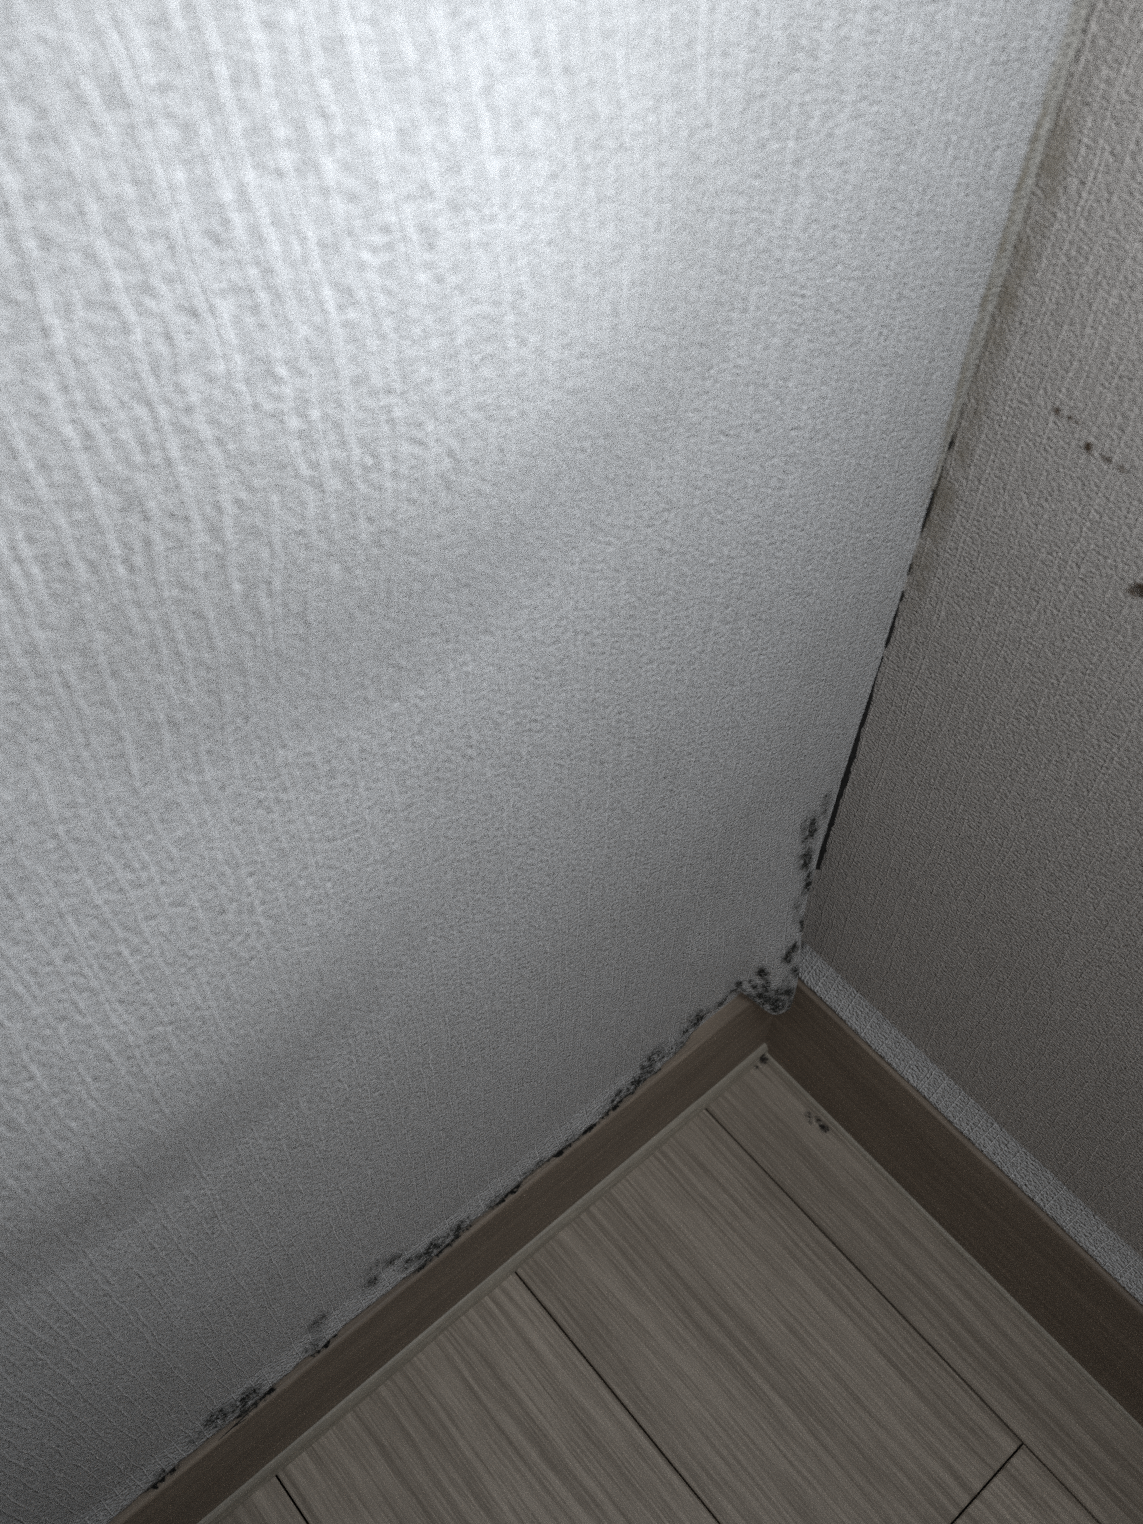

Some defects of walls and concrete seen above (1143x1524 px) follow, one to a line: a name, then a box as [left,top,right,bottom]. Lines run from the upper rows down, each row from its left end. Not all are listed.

damp [367,795,828,1288]
damp [306,1314,338,1357]
damp [190,1385,276,1444]
damp [145,1465,179,1492]